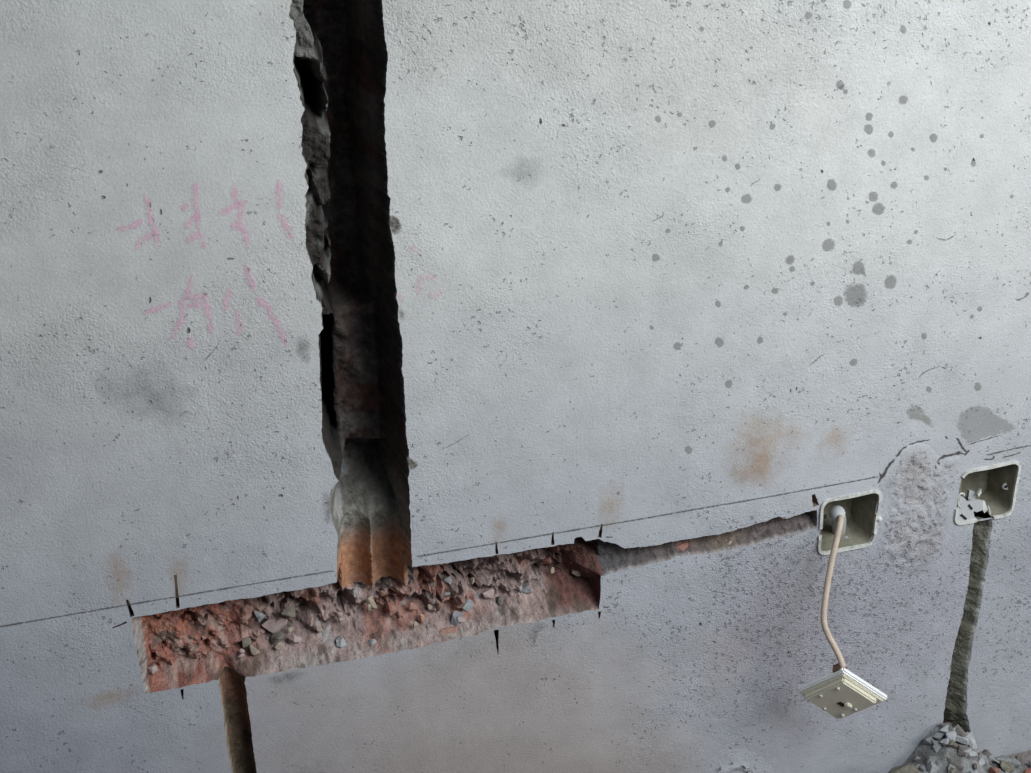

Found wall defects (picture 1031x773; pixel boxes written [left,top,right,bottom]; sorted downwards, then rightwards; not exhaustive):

spalling [390,216,401,233]
crack [417,435,1029,557]
crack [1,571,333,627]
spalling [254,605,302,650]
spalling [364,590,434,629]
spalling [450,589,503,626]
spalling [239,637,260,658]